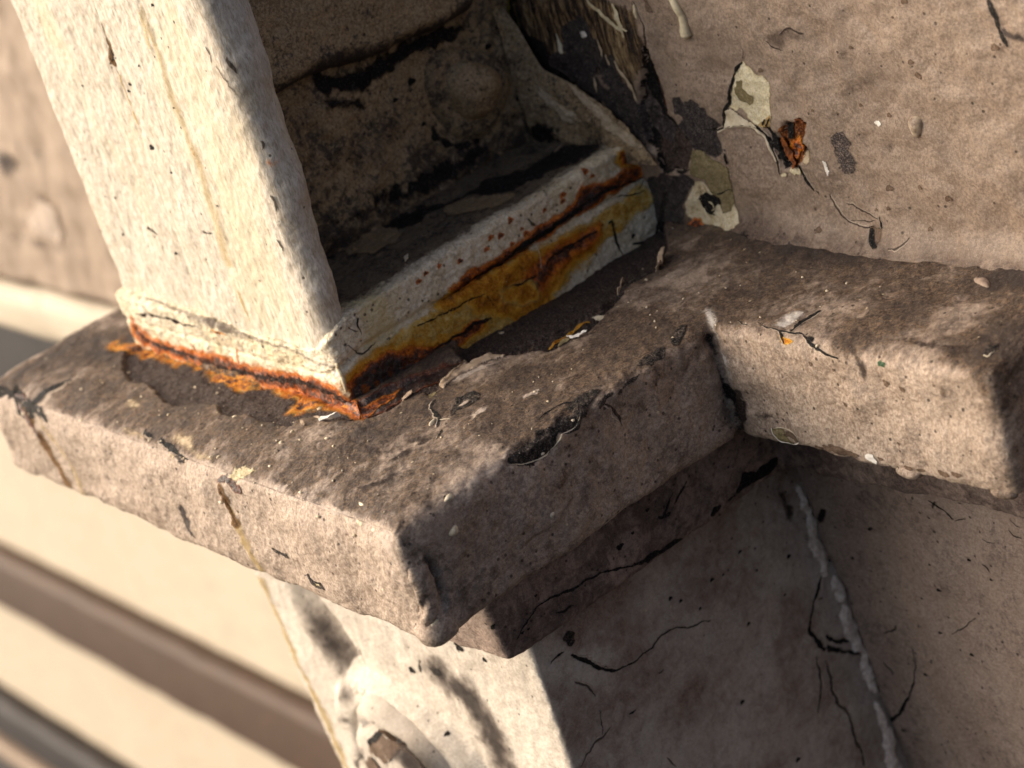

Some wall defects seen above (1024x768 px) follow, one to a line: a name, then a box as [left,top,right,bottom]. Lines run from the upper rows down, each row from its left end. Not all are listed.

peeling [341,226,404,256]
rust [107,184,653,421]
peeling [369,45,771,418]
crack [717,125,910,253]
crack [0,379,72,435]
peeling [454,325,687,496]
crack [551,620,711,766]
crack [808,576,916,766]